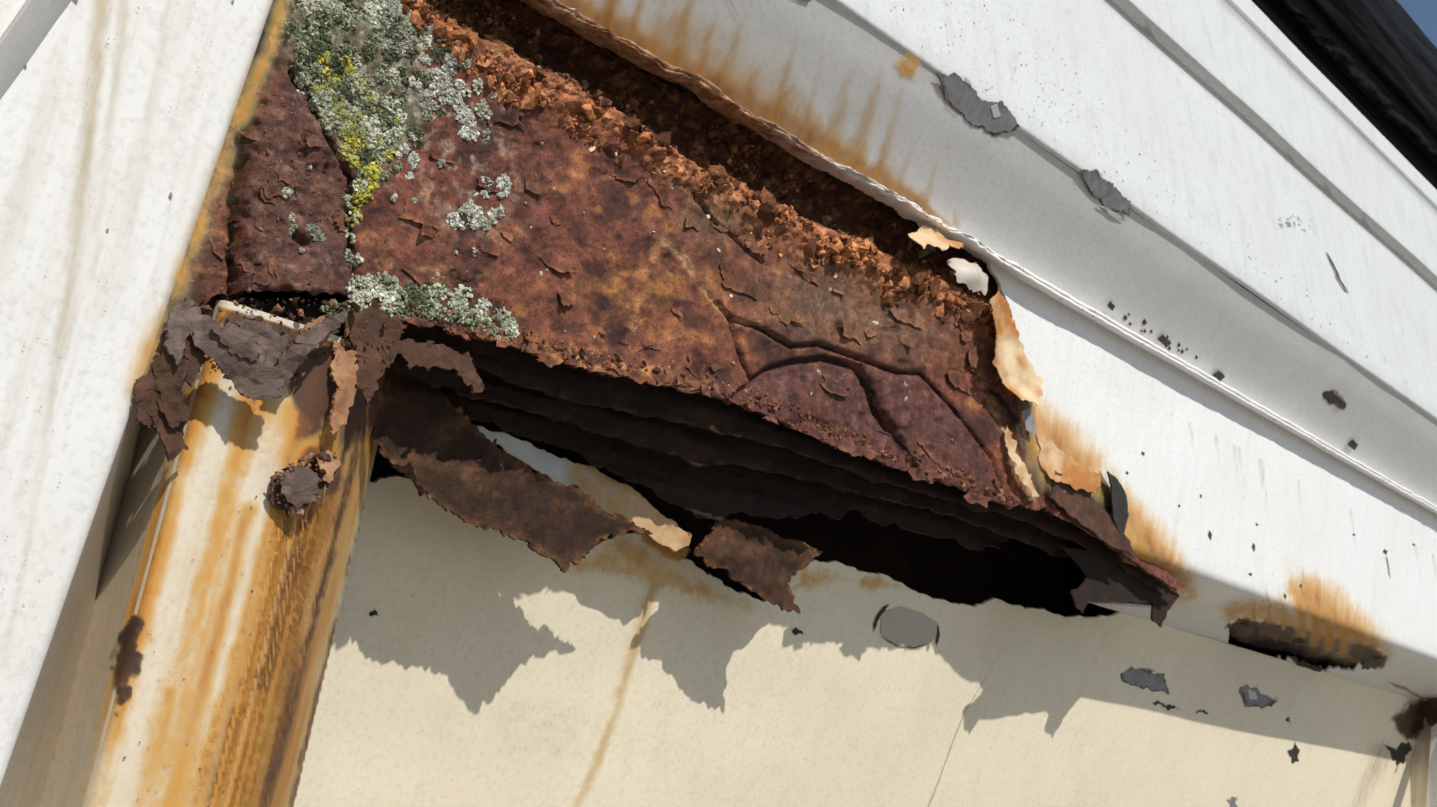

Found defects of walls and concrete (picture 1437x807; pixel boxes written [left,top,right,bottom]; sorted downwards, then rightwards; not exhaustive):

peeling [937,72,1020,136]
peeling [1079,169,1131,219]
peeling [908,226,1101,498]
rust [99,0,1193,807]
peeling [874,604,940,649]
rust [1220,577,1388,672]
peeling [1120,666,1179,711]
peeling [1239,684,1276,708]
rust [1393,697,1437,739]